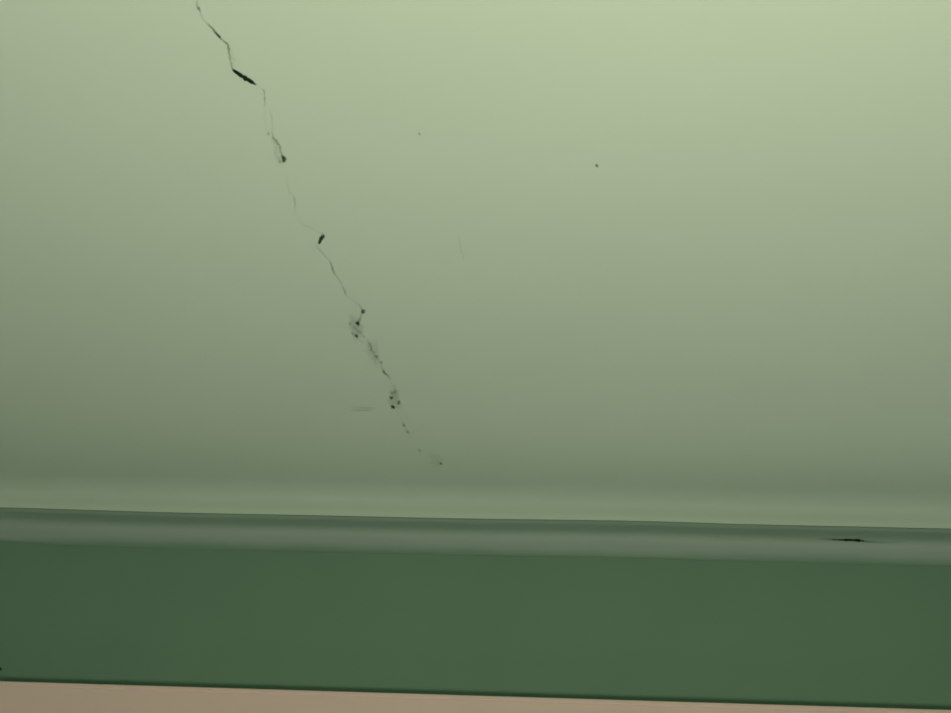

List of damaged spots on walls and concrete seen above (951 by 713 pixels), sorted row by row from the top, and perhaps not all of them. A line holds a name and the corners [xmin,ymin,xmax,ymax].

crack [233,69,256,85]